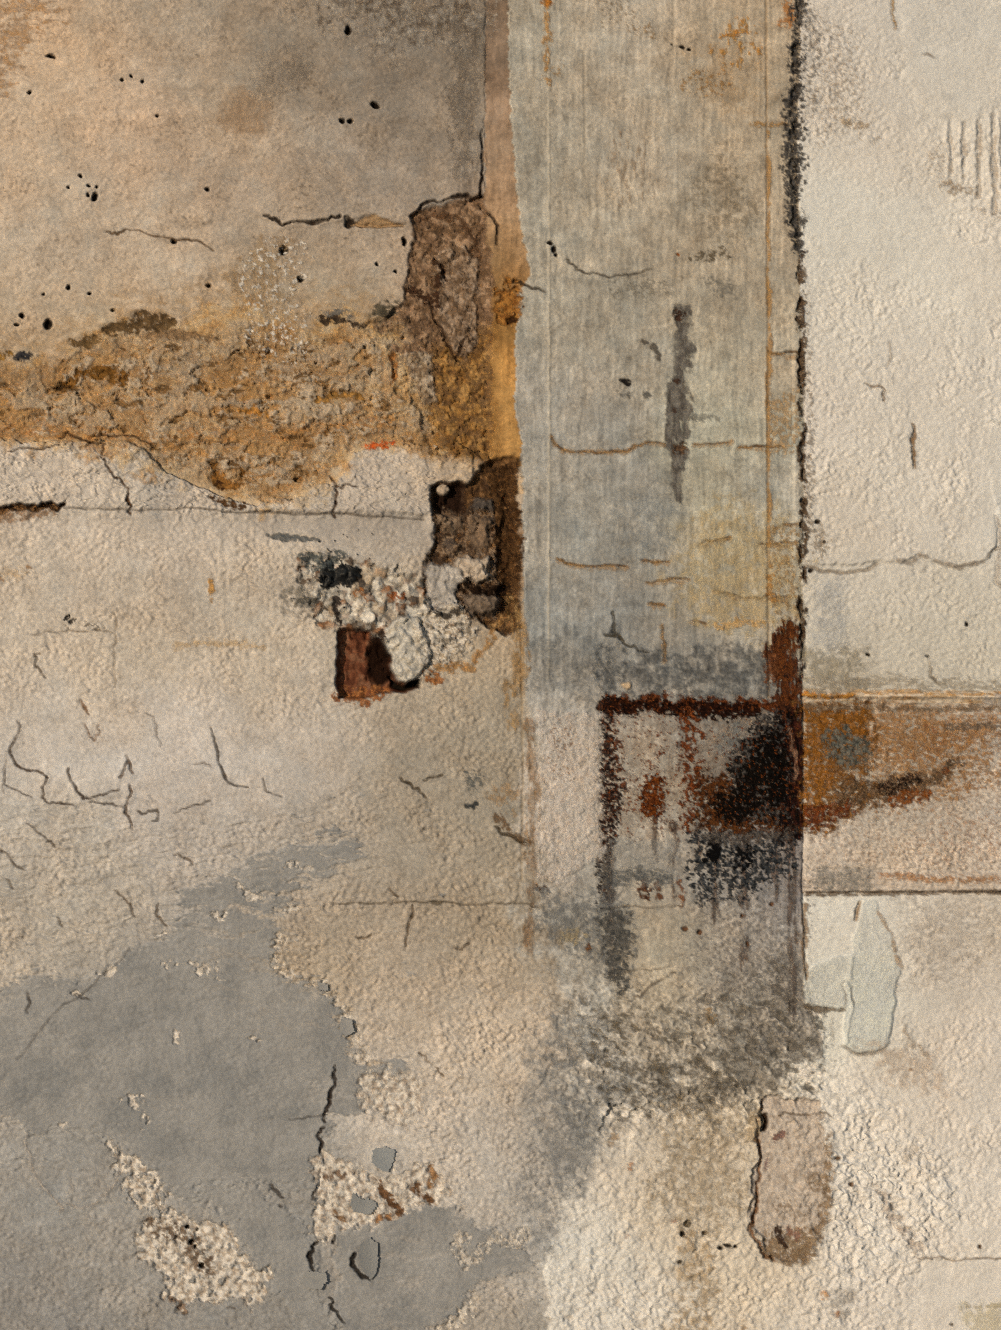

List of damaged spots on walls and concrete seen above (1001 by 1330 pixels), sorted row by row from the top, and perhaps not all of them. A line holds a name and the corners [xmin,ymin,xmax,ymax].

crack [265,215,365,228]
crack [0,432,423,520]
flaking render [0,198,526,708]
leakage [620,304,719,502]
corrosion [595,156,1001,1020]
crack [3,724,269,847]
leakage [594,844,677,902]
peeling [803,912,901,1056]
flaking render [105,1140,273,1314]
crack [307,1235,370,1323]
peeling [308,1146,452,1279]
flaking render [748,1095,834,1265]